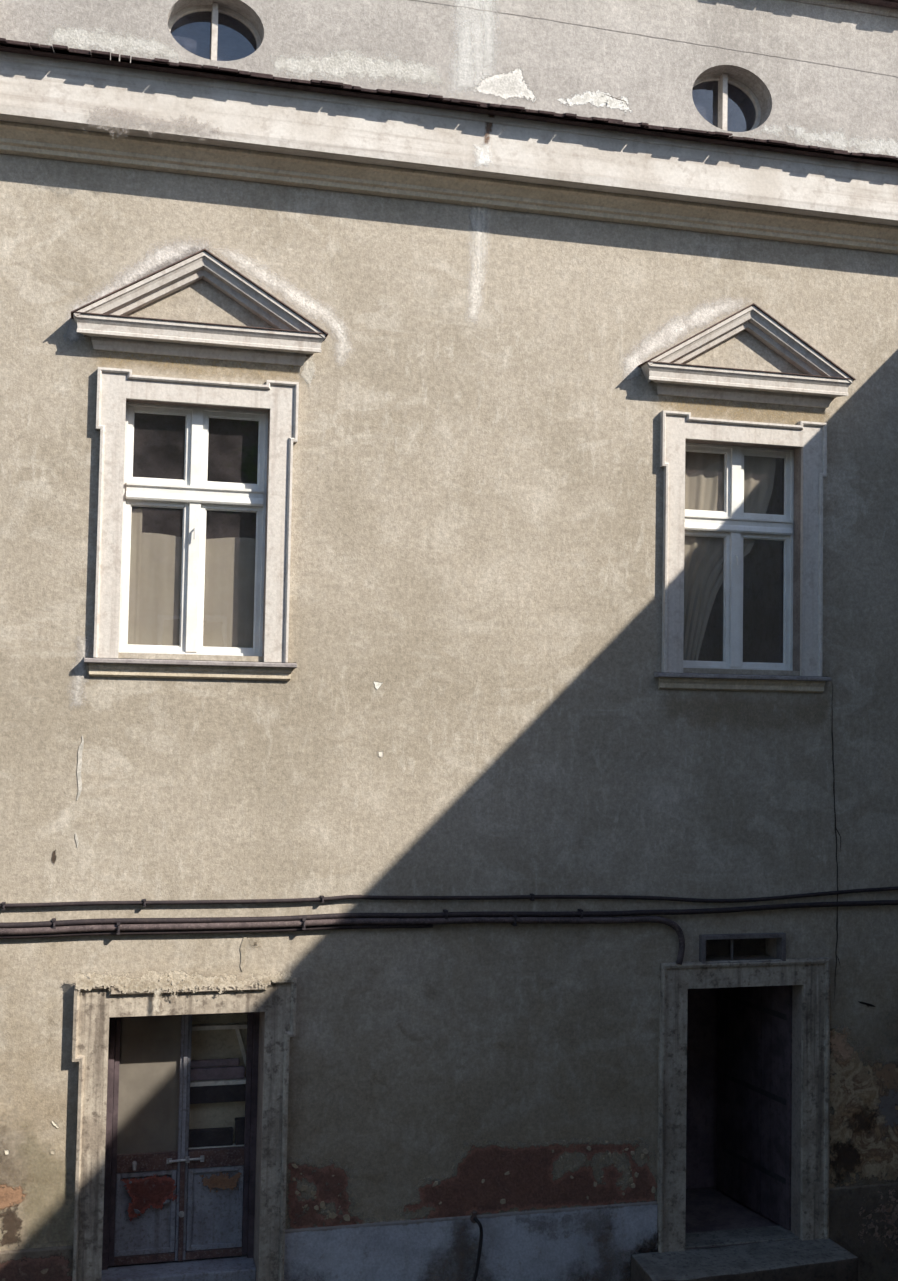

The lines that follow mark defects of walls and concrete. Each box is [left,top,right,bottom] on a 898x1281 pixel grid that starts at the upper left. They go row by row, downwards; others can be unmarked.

flaking render [557,90,632,114]
water stain [468,206,488,319]
flaking render [286,1138,657,1229]
flaking render [829,1026,898,1252]
flaking render [0,1184,72,1281]